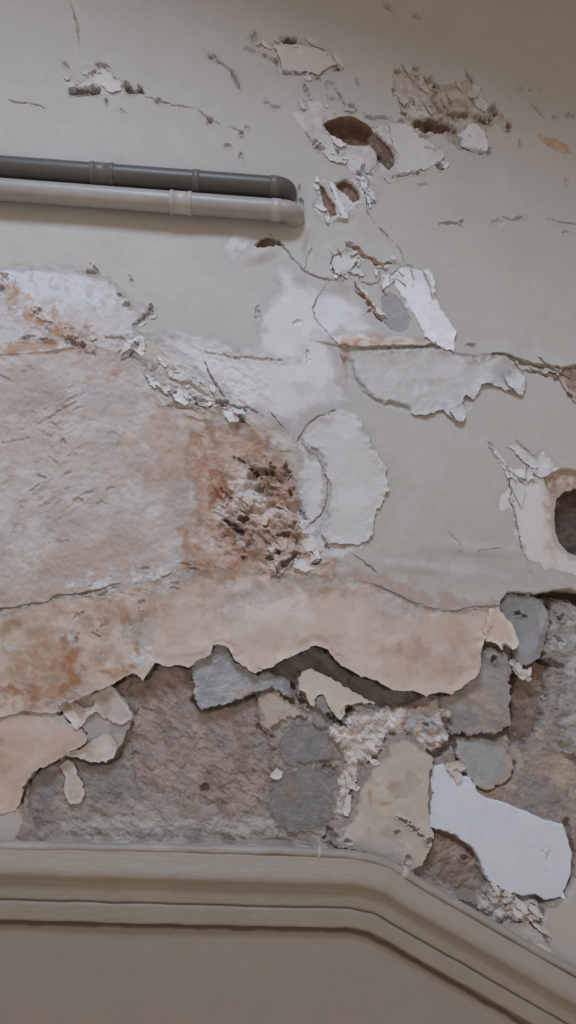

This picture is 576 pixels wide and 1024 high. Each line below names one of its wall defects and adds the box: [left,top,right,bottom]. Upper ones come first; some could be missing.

peeling [62,62,144,97]
peeling [248,31,344,81]
crack [145,96,247,134]
peeling [291,64,513,224]
crack [273,167,437,350]
crack [491,352,576,378]
leakage [119,335,456,621]
crack [0,584,114,610]
leakage [64,558,192,596]
flaking render [0,247,576,953]
crack [356,556,496,613]